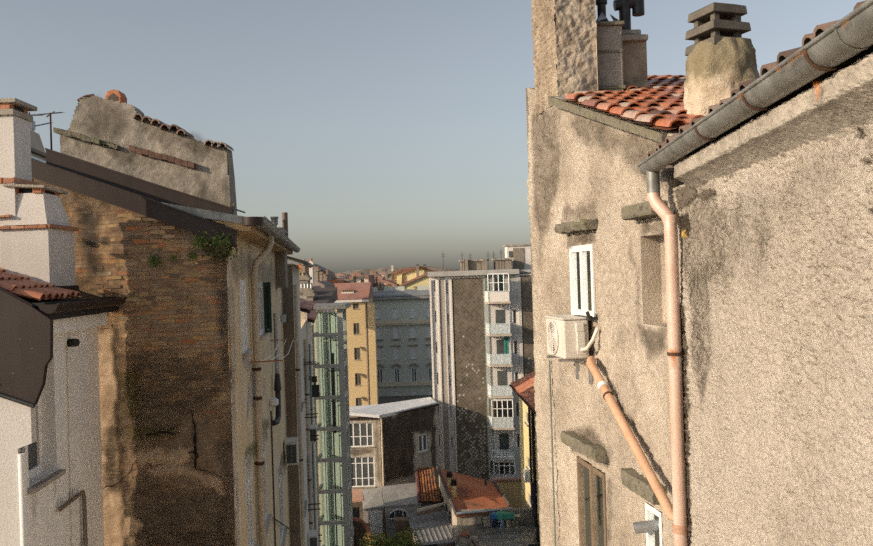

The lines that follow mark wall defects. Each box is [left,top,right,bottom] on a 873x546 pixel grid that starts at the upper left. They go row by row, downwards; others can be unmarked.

leakage [121,357,218,441]
crack [146,408,212,474]
leakage [105,426,233,546]